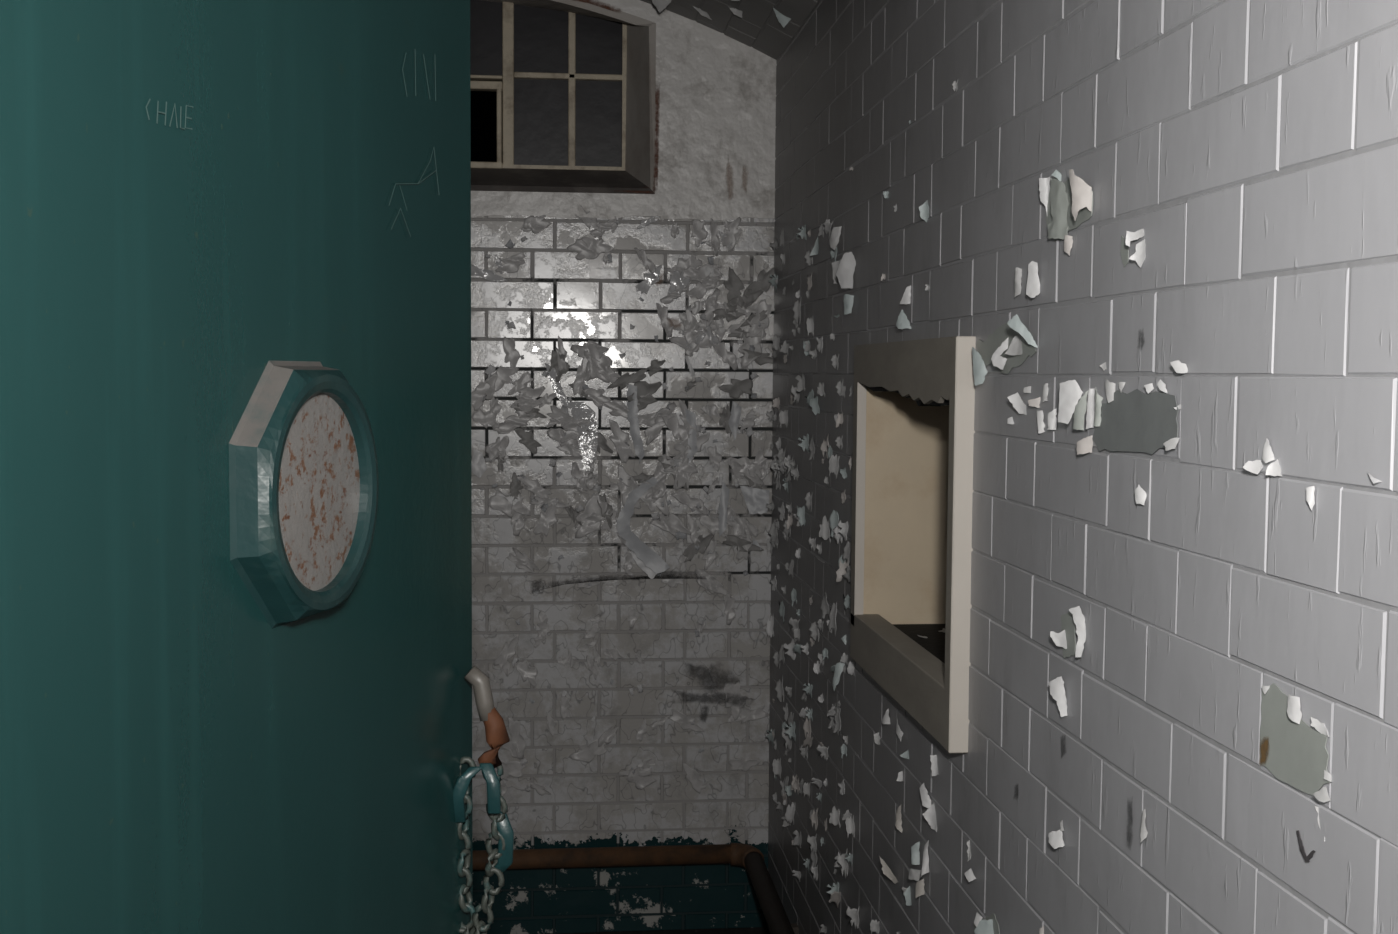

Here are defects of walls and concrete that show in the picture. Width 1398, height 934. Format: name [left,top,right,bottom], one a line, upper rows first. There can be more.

peeling [567,205,620,264]
peeling [1039,169,1093,256]
peeling [1120,229,1146,268]
peeling [972,261,1040,386]
peeling [1007,360,1188,455]
peeling [1243,438,1283,477]
peeling [471,215,949,934]
peeling [1050,606,1086,659]
water stain [682,665,745,720]
peeling [1048,676,1068,717]
peeling [1259,683,1332,842]
peeling [1048,820,1065,849]